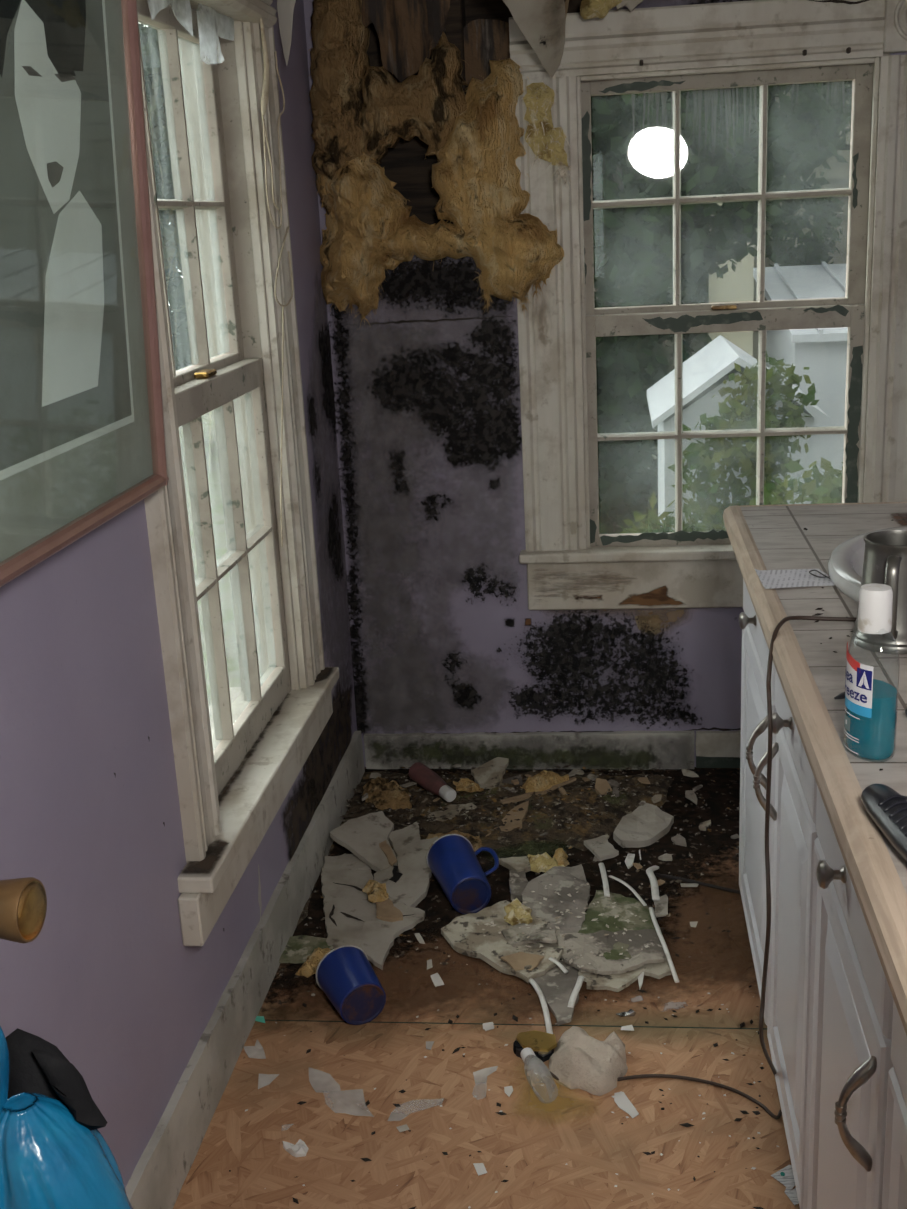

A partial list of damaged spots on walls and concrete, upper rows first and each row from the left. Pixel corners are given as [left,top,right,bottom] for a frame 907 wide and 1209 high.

peeling [277,0,296,65]
peeling [600,80,685,93]
peeling [581,111,592,221]
peeling [642,311,763,333]
peeling [803,305,849,316]
peeling [845,346,863,503]
peeling [590,519,729,546]
water stain [891,513,907,526]
water stain [283,256,702,861]